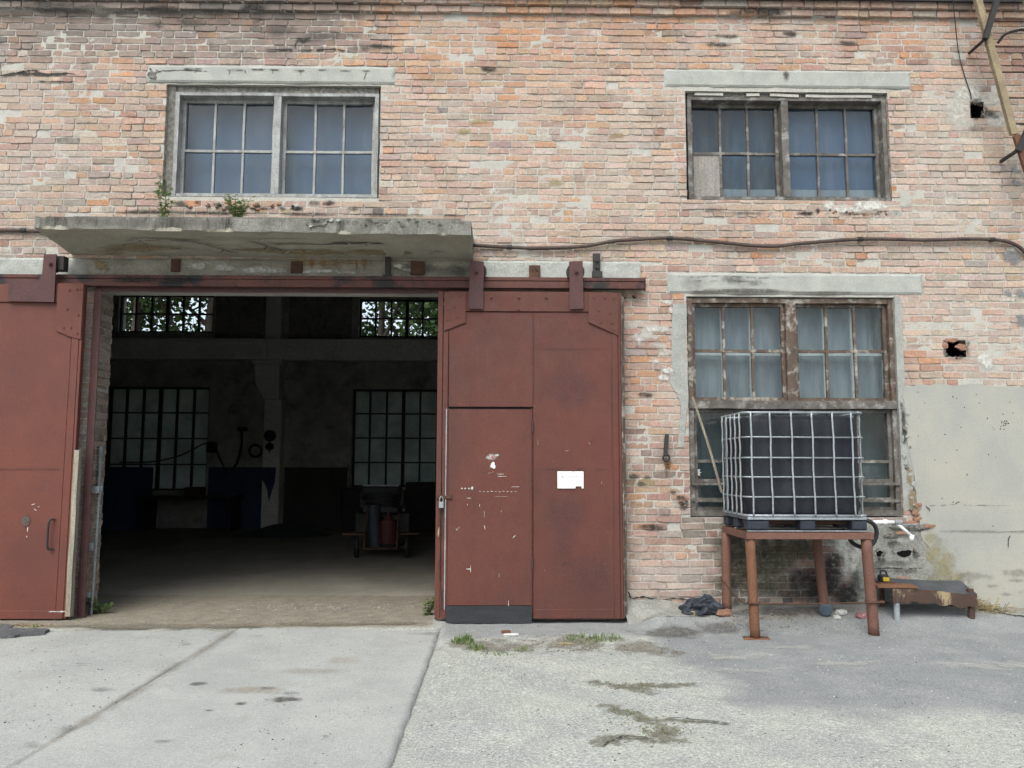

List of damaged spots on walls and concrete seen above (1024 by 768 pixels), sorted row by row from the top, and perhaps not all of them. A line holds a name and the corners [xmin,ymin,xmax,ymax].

spalling [942,338,969,359]
flaking render [876,402,936,561]